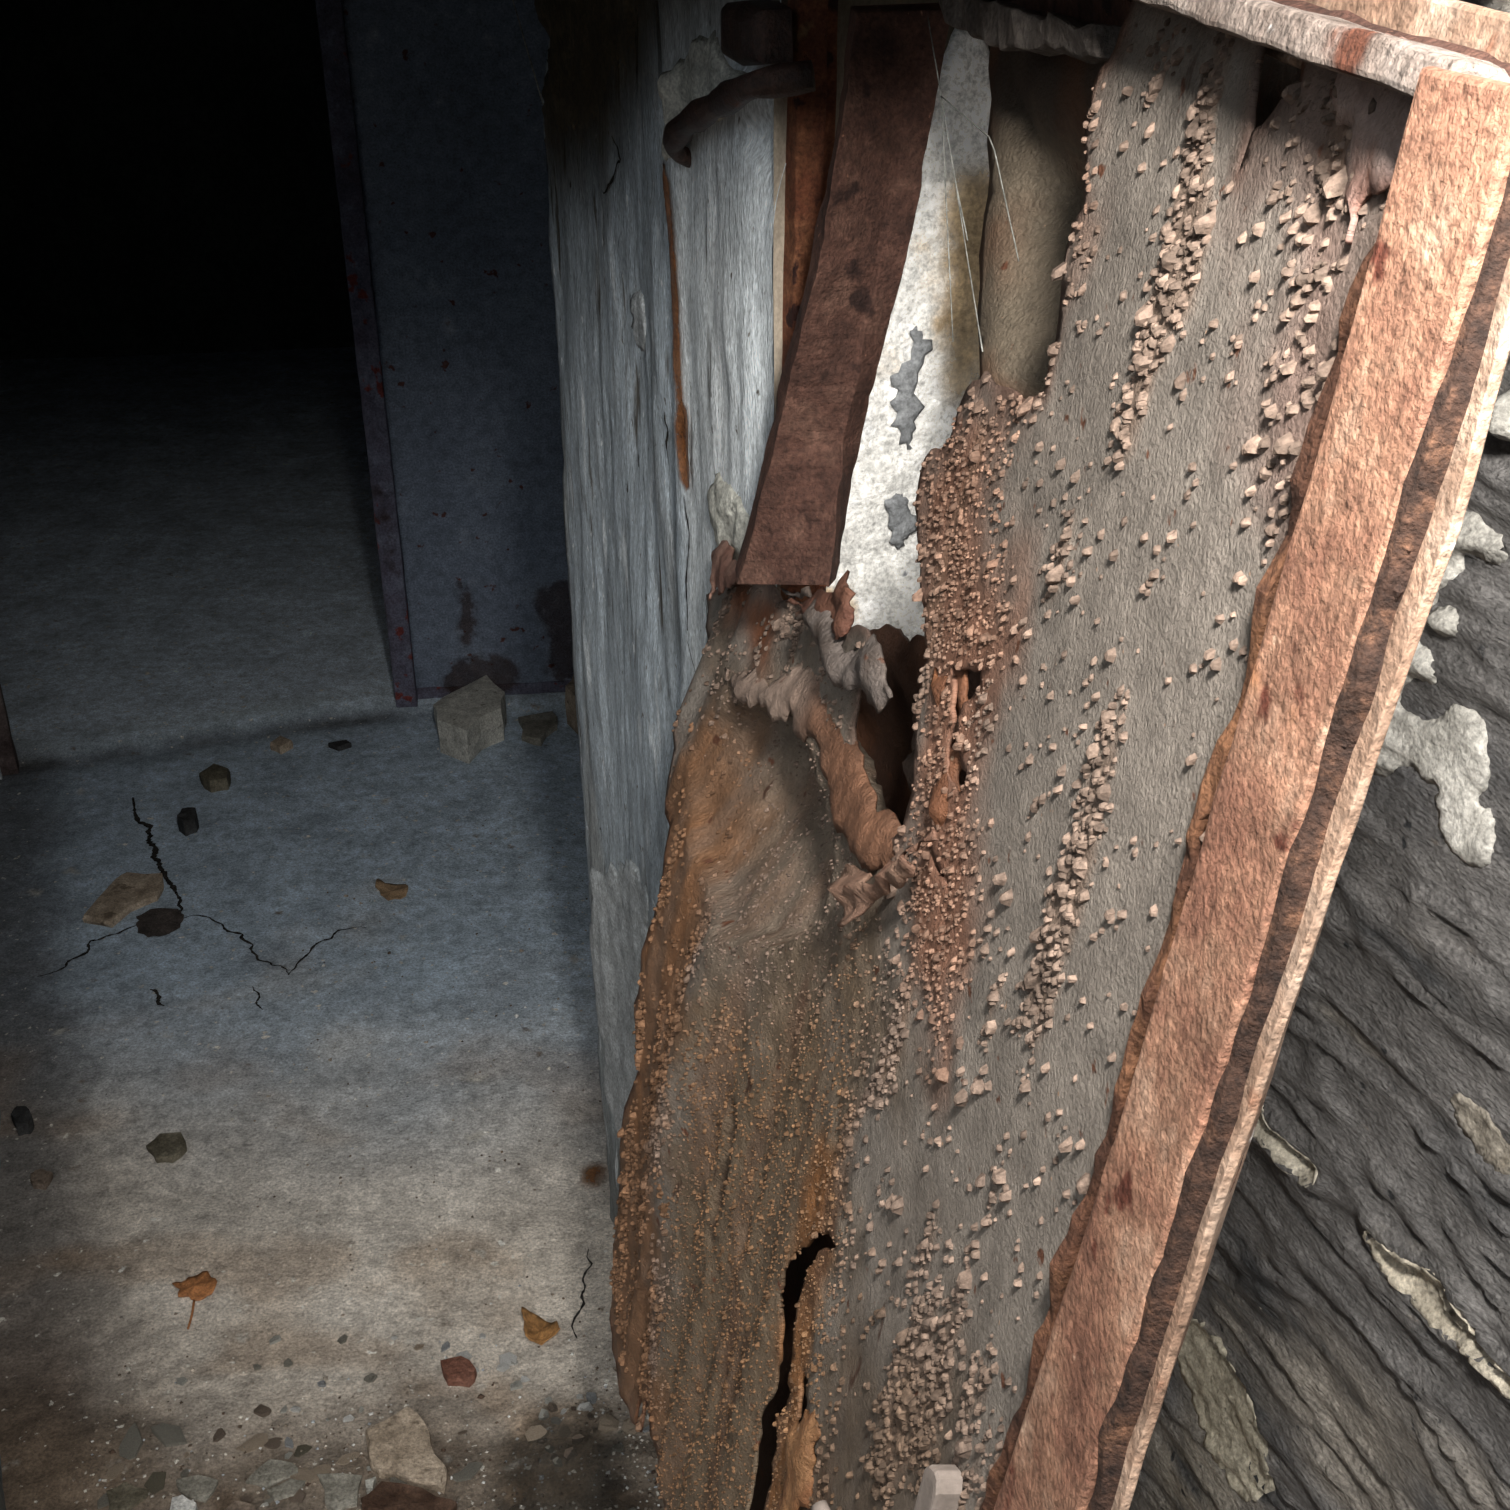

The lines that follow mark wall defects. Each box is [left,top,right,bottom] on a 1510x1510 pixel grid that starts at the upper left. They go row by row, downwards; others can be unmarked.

peeling [780,28,991,718]
peeling [902,714,916,792]
peeling [928,739,962,832]
rust [583,18,1385,1510]
crack [37,925,136,977]
crack [132,797,366,1010]
flaking render [1253,1105,1318,1188]
flaking render [1362,1230,1510,1399]
flaking render [1177,1317,1275,1502]